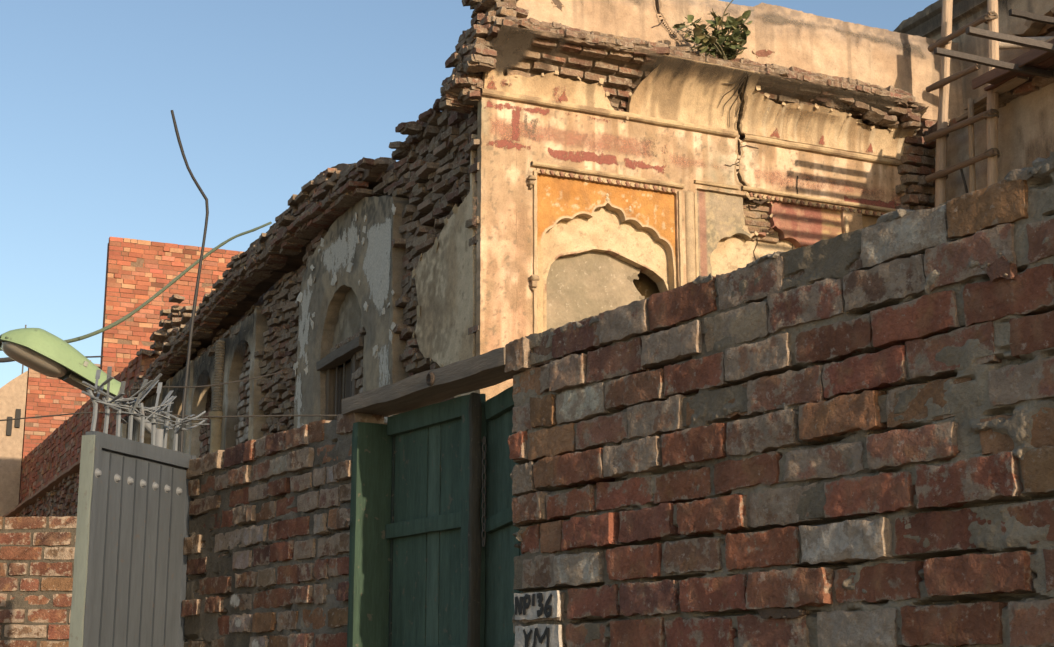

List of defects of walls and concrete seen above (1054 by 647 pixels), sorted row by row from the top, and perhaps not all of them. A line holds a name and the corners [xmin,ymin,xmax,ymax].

crack [652,0,684,47]
spalling [502,37,653,120]
spalling [755,83,900,132]
spalling [143,109,480,437]